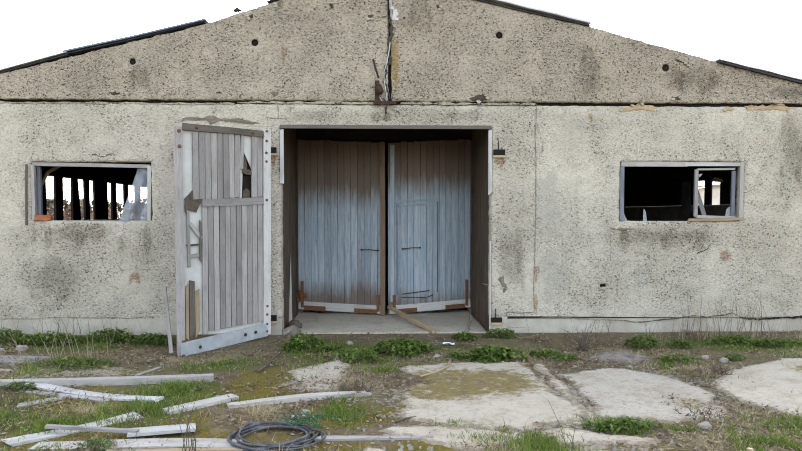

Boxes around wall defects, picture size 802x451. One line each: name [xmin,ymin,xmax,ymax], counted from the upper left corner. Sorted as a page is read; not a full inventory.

spalling [617,103,656,112]
crack [506,104,802,331]